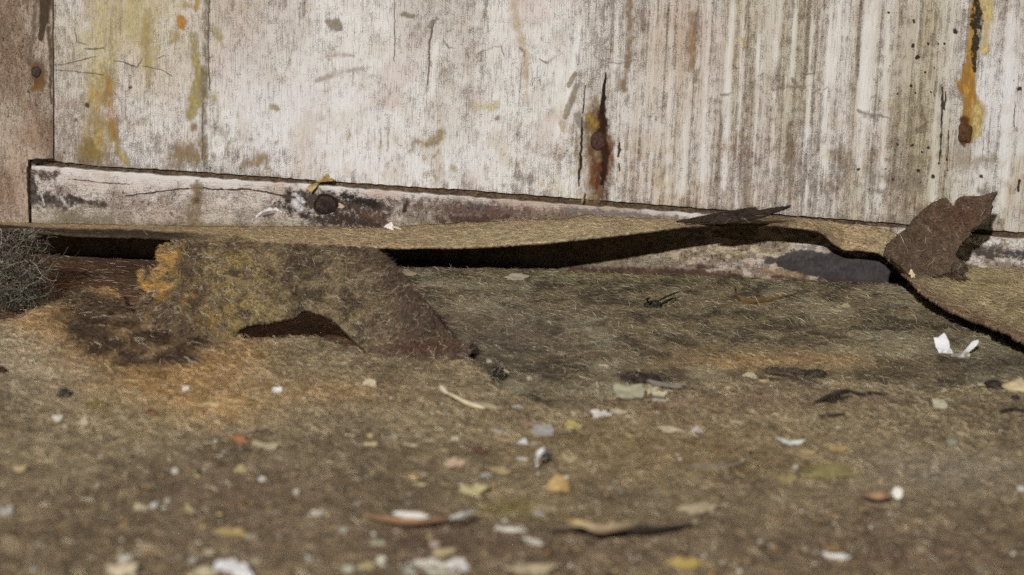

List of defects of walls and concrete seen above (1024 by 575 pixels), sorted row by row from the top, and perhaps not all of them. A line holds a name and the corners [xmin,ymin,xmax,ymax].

rust [577,81,615,203]
rust [956,0,994,164]
peeling [554,263,865,283]
peeling [966,237,1024,264]